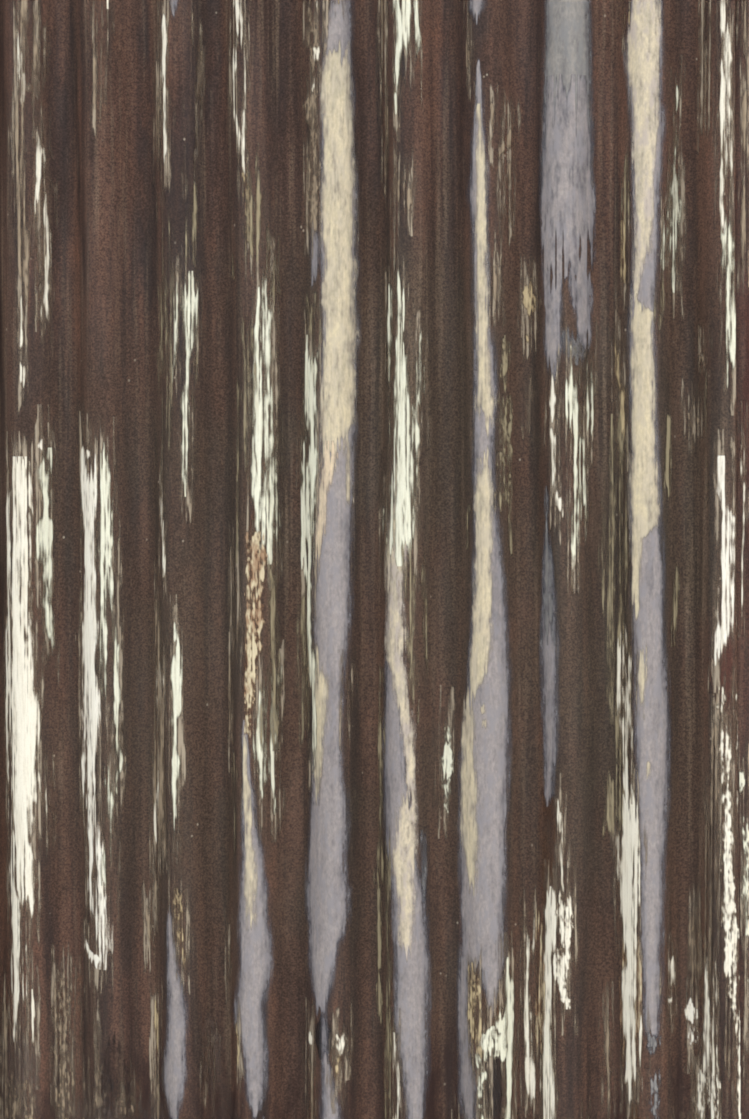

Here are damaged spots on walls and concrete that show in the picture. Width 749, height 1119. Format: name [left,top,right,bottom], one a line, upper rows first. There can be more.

peeling [8,0,58,412]
peeling [92,0,109,136]
peeling [153,0,178,190]
peeling [191,14,205,136]
peeling [0,404,126,1119]
peeling [115,174,199,1119]
peeling [225,0,359,1119]
peeling [373,0,598,1119]
rust [555,773,576,905]
peeling [598,0,749,1119]
rust [713,640,732,700]
rust [487,1051,502,1119]